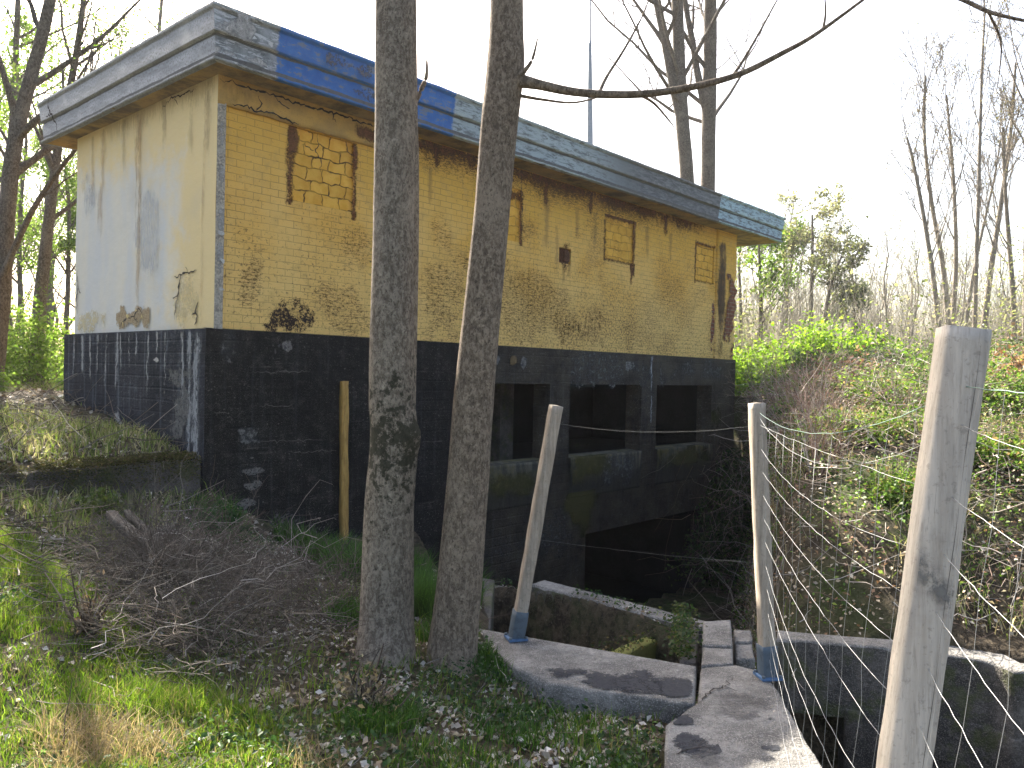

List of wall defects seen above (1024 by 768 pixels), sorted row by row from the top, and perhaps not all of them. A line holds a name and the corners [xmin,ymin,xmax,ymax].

crack [227,80,373,172]
spalling [78,305,150,332]
water stain [74,332,166,383]
crack [173,268,198,325]
water stain [181,332,200,461]
water stain [264,281,370,337]
water stain [501,254,604,346]
spalling [710,273,737,358]